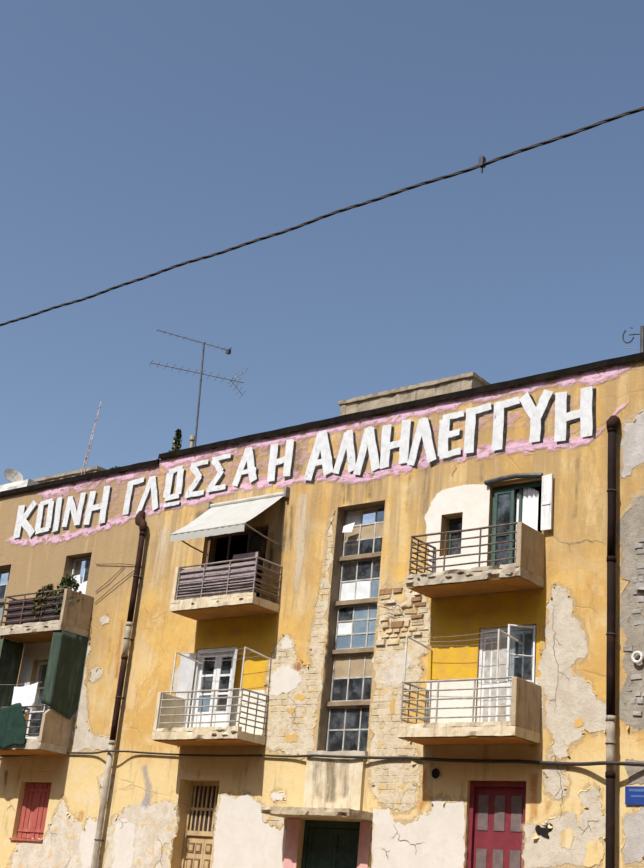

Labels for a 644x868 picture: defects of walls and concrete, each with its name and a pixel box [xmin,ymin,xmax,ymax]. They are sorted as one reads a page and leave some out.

spalling [619,407,644,479]
peeling [72,642,116,755]
peeling [263,511,337,760]
spalling [368,582,433,814]
peeling [521,486,644,868]
peeling [6,773,179,868]